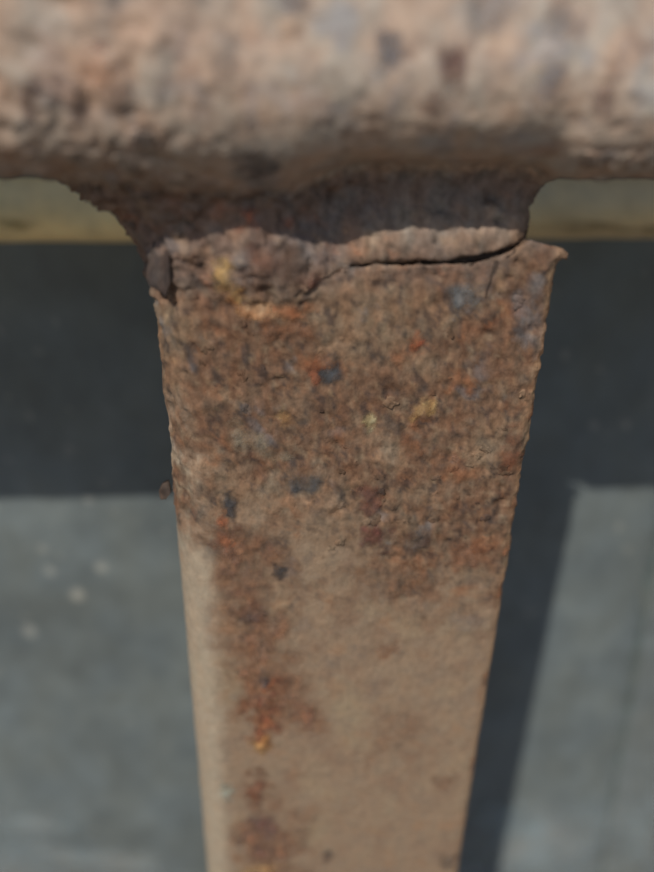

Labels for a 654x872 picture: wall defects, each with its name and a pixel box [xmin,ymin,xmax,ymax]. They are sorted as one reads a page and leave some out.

rust [146,237,171,299]
rust [214,259,312,343]
crack [298,230,528,298]